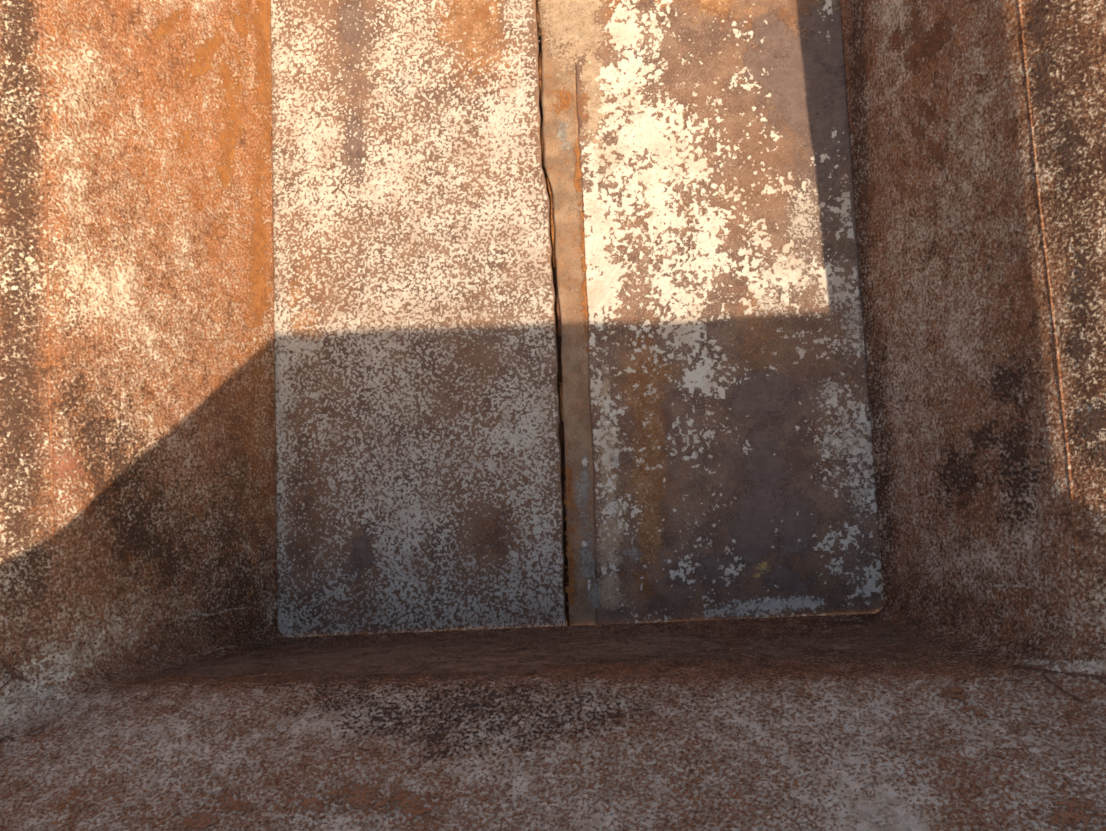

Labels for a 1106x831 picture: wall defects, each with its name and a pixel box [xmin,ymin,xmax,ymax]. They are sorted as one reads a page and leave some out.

rust [432,0,503,73]
rust [654,0,734,20]
rust [888,0,957,74]
rust [169,123,197,162]
rust [180,0,327,407]
rust [573,131,591,352]
peeling [580,0,884,623]
rust [911,96,947,176]
rust [291,419,316,574]
rust [564,441,578,626]
rust [624,357,690,577]
rust [281,776,440,825]